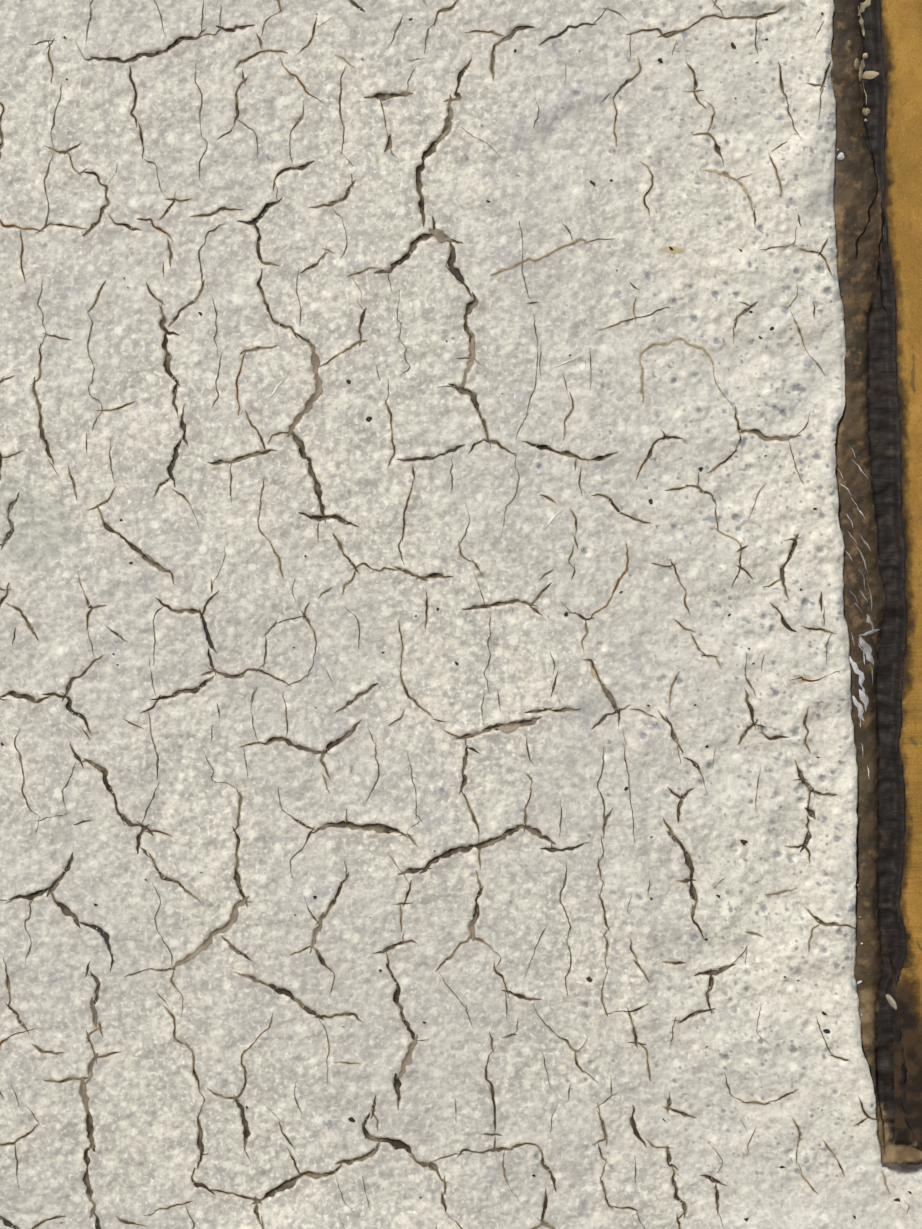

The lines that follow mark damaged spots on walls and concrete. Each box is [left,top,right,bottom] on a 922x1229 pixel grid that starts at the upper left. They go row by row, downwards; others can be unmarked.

crack [470,0,785,225]
crack [768,62,802,197]
crack [808,61,831,115]
crack [760,214,832,275]
crack [639,288,838,682]
crack [0,0,721,1229]
crack [738,652,837,862]
crack [767,888,857,948]
crack [630,931,763,1046]
crack [816,1017,848,1061]
crack [700,1146,727,1228]
crack [725,1075,844,1195]